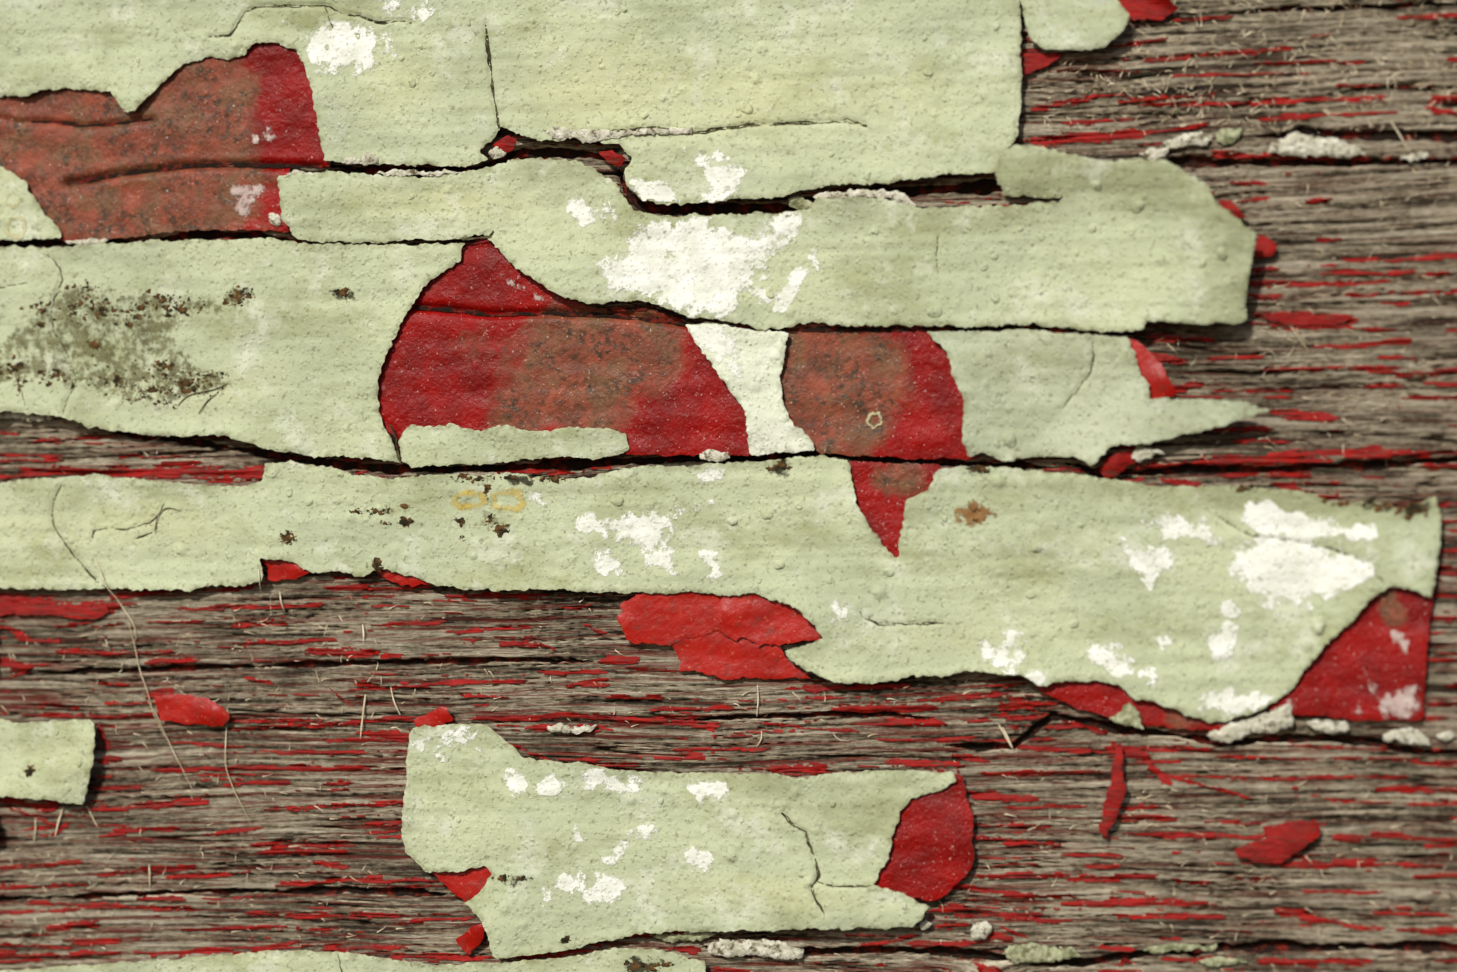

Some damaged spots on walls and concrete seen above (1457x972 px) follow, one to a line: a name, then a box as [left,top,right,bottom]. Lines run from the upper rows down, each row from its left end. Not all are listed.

crack [209,4,411,38]
crack [30,118,154,128]
crack [67,25,1003,216]
crack [0,229,494,415]
peeling [0,0,1442,727]
peeling [0,706,956,972]
peeling [1099,744,1126,837]
peeling [1234,819,1320,864]